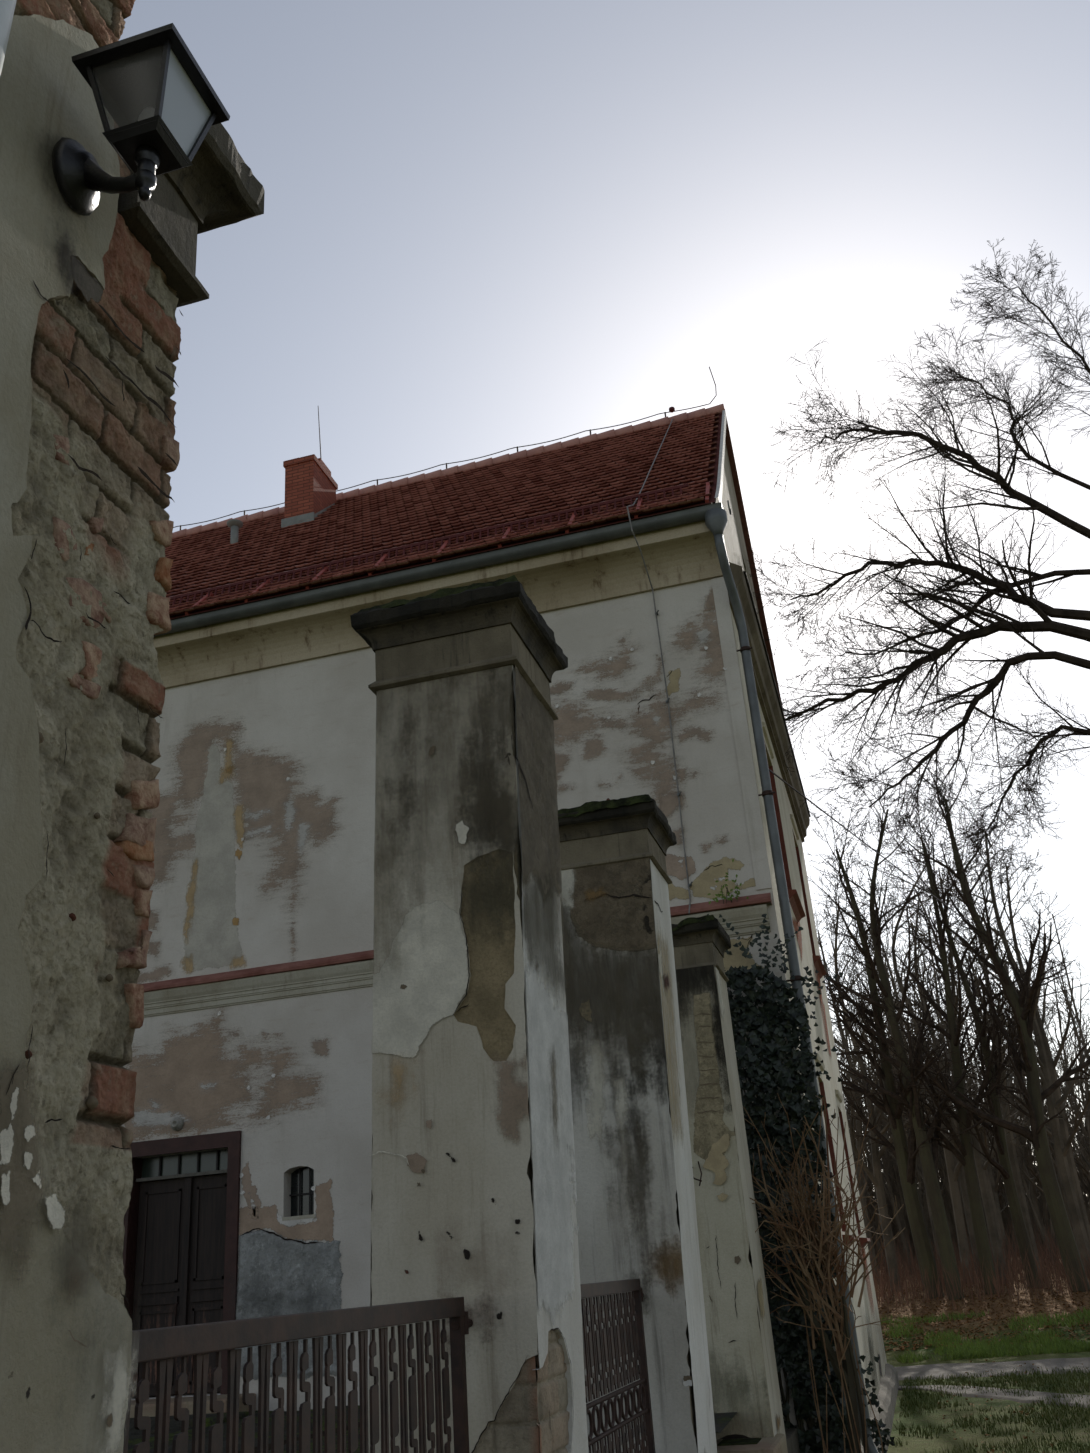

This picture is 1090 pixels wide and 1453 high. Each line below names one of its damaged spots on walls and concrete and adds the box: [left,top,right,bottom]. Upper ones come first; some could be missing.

flaking render [0,212,343,1320]
flaking render [238,1334,337,1380]
peeling [369,588,764,1453]
damp [524,881,726,1209]